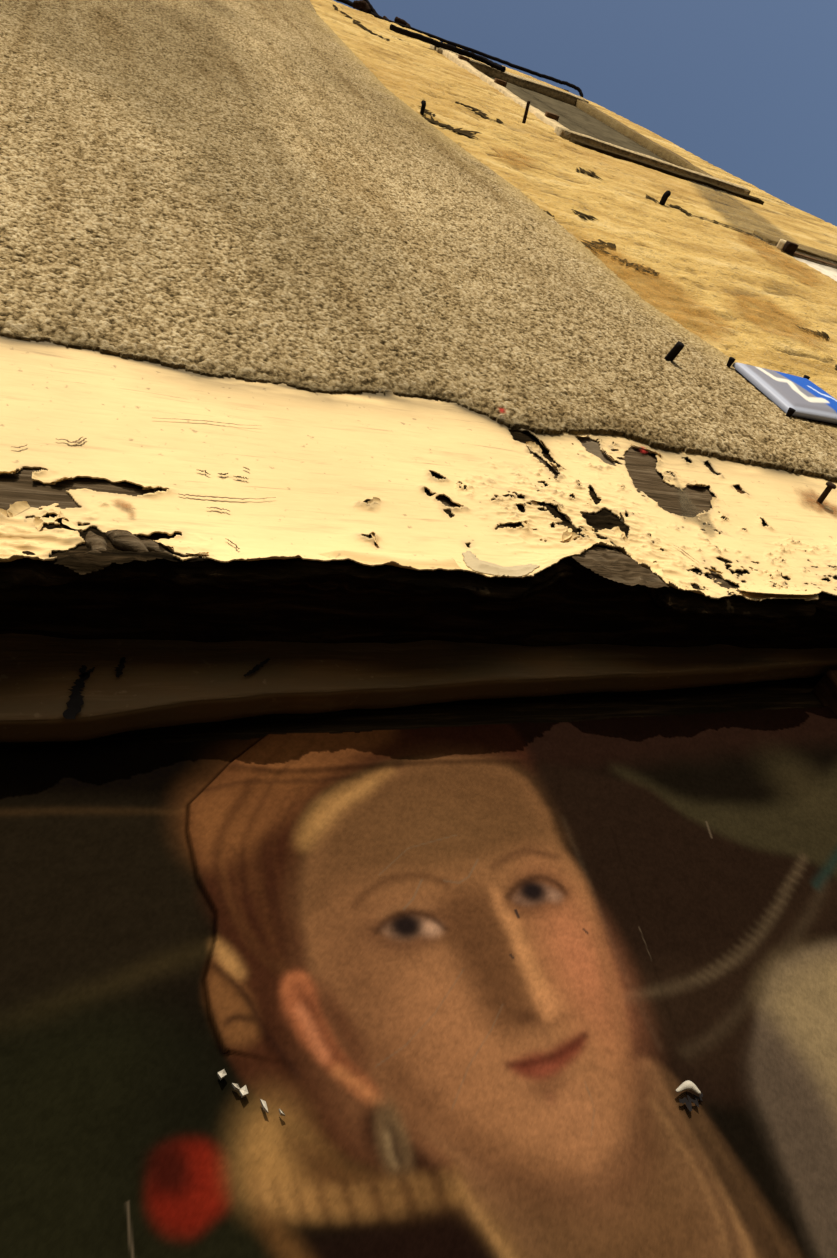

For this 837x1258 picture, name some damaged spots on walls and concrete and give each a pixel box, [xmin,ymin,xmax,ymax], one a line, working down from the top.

peeling [424,474,463,518]
peeling [509,430,561,479]
peeling [577,435,716,518]
peeling [0,468,212,575]
peeling [462,544,540,577]
peeling [495,520,528,530]
peeling [528,488,671,590]
peeling [691,557,837,595]